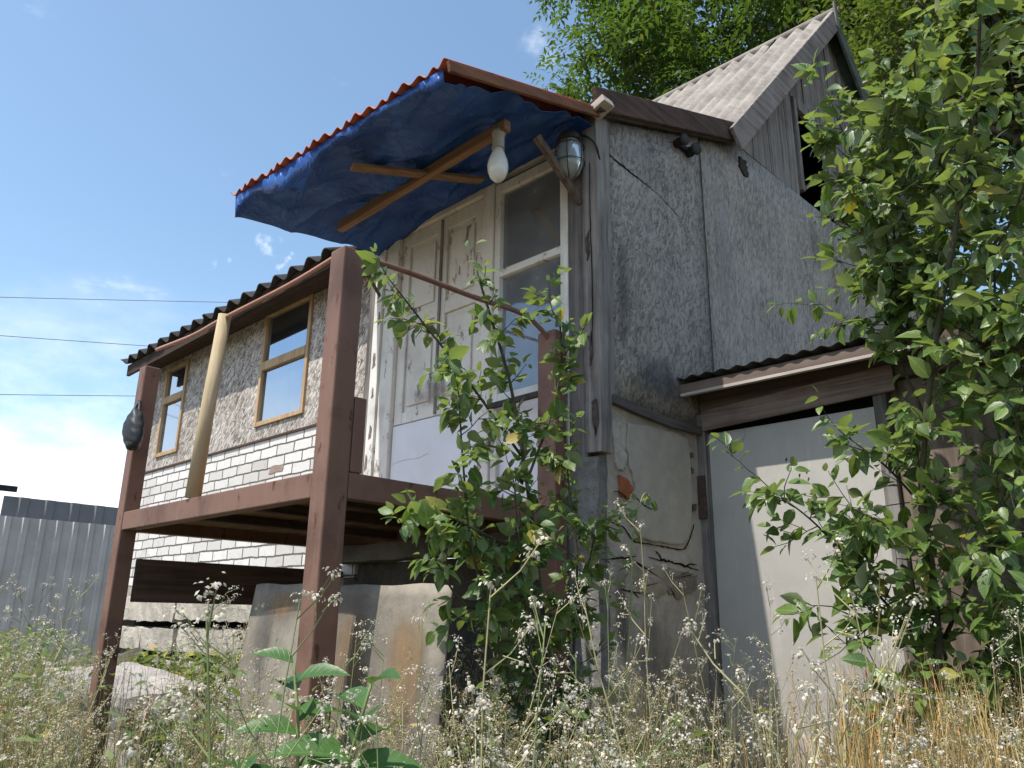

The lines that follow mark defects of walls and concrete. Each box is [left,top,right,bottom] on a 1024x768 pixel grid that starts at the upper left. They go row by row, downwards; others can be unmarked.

spalling [612,409,634,499]
crack [607,491,699,571]